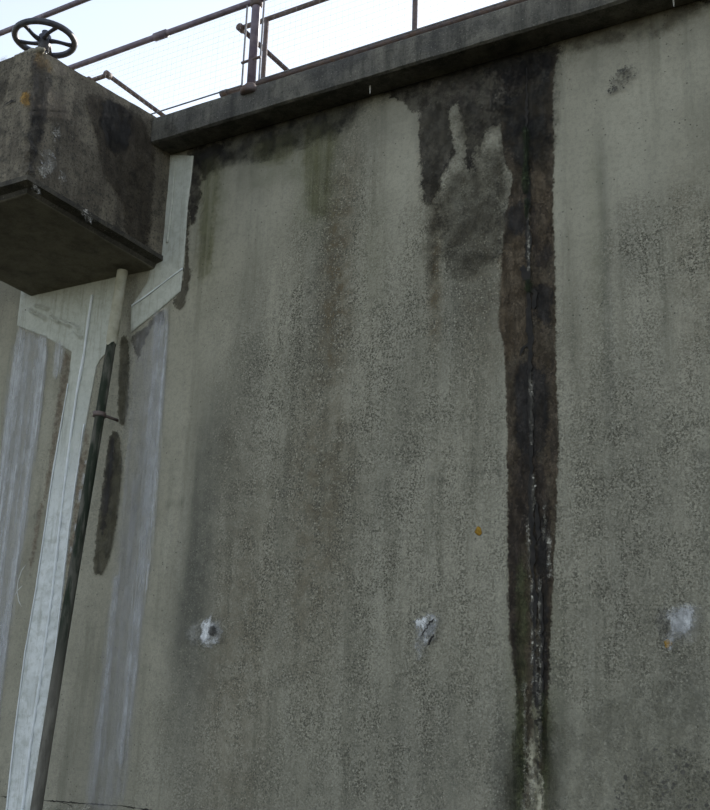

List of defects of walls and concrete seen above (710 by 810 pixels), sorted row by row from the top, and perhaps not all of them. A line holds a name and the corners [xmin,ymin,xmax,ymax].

leakage [87,93,156,246]
leakage [173,96,370,310]
leakage [380,0,710,810]
leakage [93,311,167,759]
spalling [200,618,223,647]
spalling [416,615,437,651]
spalling [655,605,694,649]